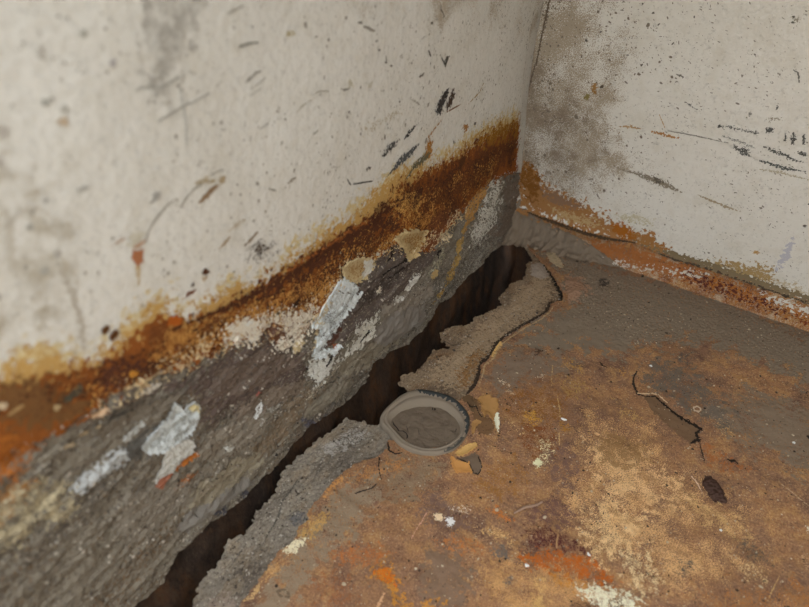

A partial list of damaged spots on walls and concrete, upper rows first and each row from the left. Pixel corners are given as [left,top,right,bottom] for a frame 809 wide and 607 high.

peeling [661,0,808,146]
spalling [530,252,564,280]
crack [306,354,353,389]
crack [466,255,563,417]
rust [0,367,248,607]
spalling [316,428,370,461]
crack [355,421,419,494]
peeling [433,512,456,528]
peeling [450,394,500,475]
rust [411,375,624,607]
crack [632,371,705,463]
rust [329,539,448,607]